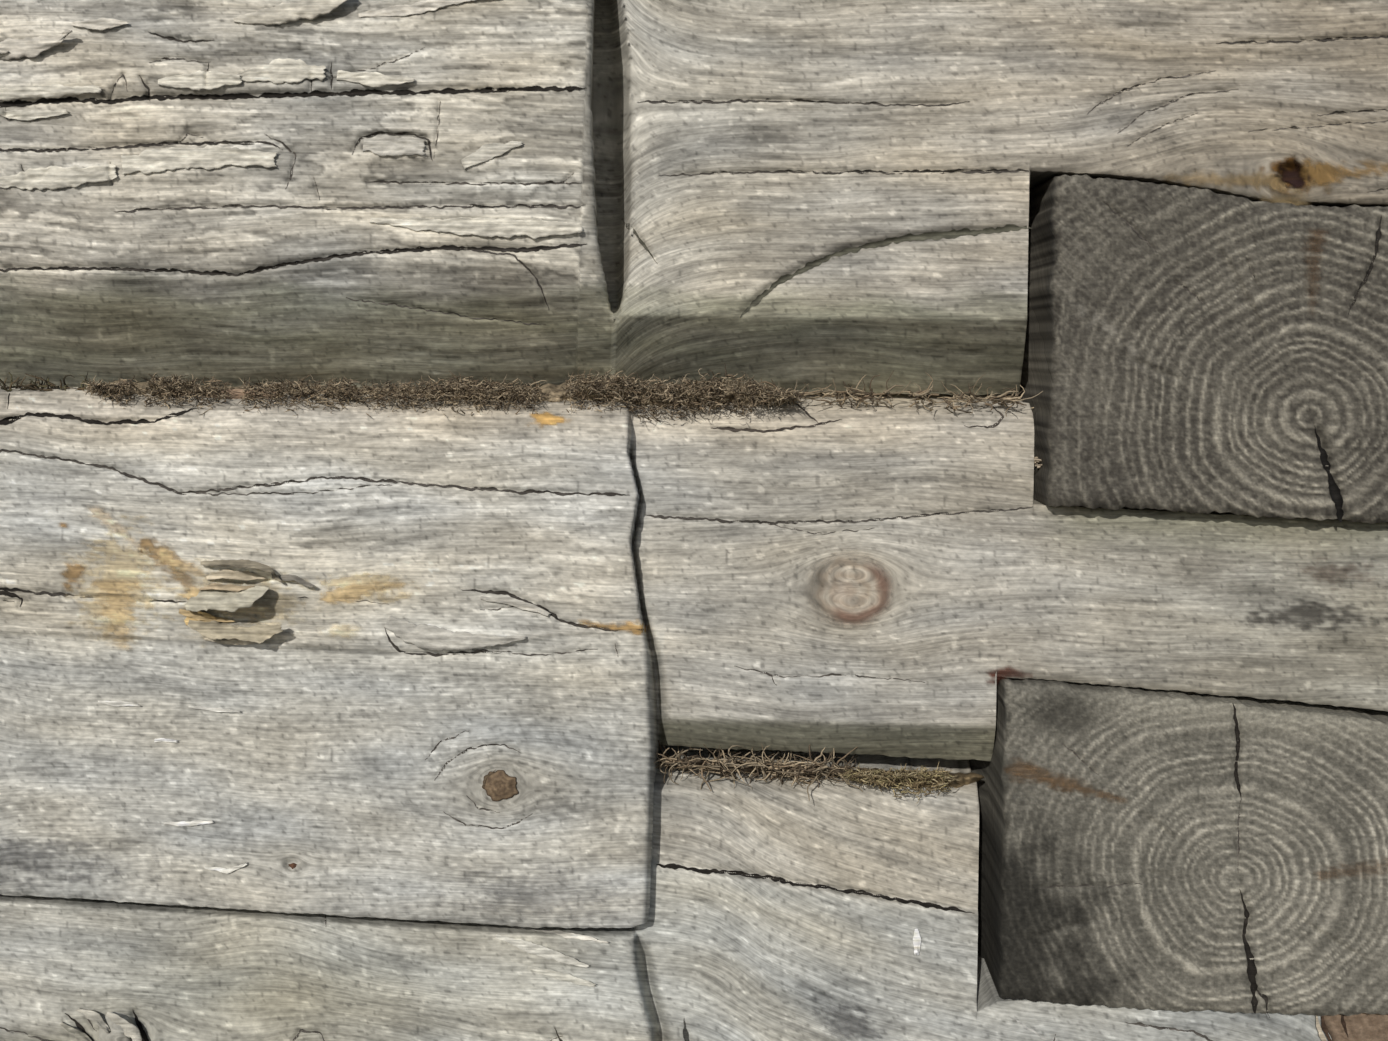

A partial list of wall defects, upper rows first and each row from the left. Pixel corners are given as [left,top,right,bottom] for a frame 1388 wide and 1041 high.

crack [0,32,587,213]
crack [0,244,585,325]
crack [0,393,1031,535]
crack [1315,428,1344,523]
peeling [179,559,315,645]
crack [656,863,972,913]
crack [1233,704,1270,1018]
crack [1126,1022,1213,1041]